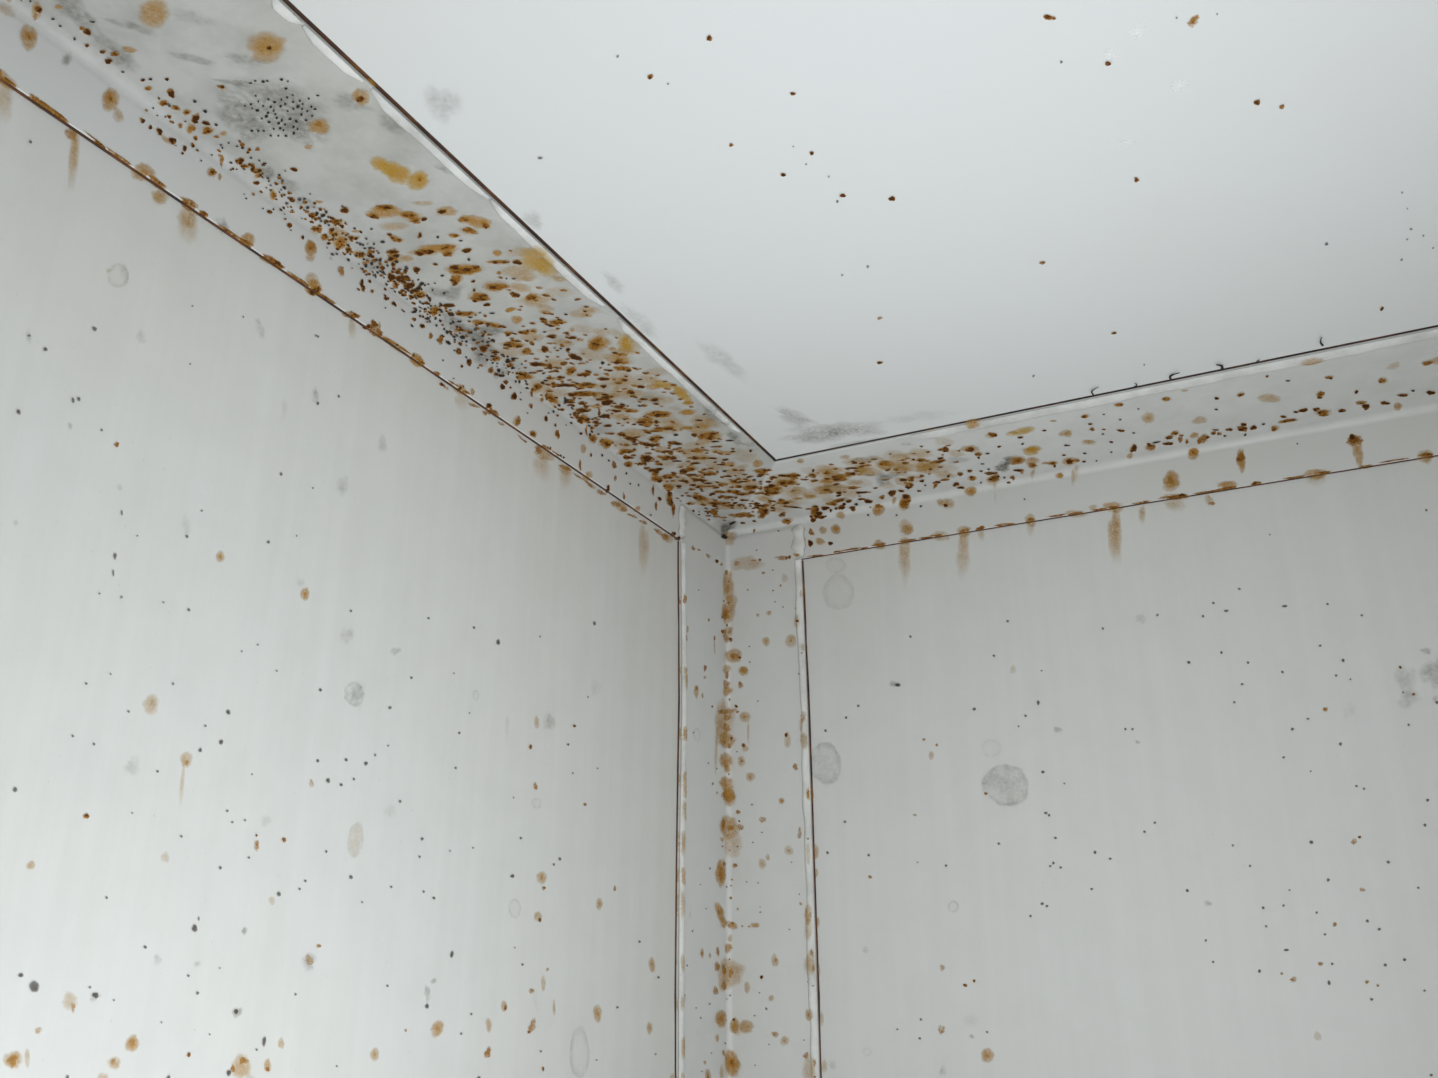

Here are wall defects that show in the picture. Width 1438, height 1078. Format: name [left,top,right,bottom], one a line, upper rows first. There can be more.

leakage [244,79,320,137]